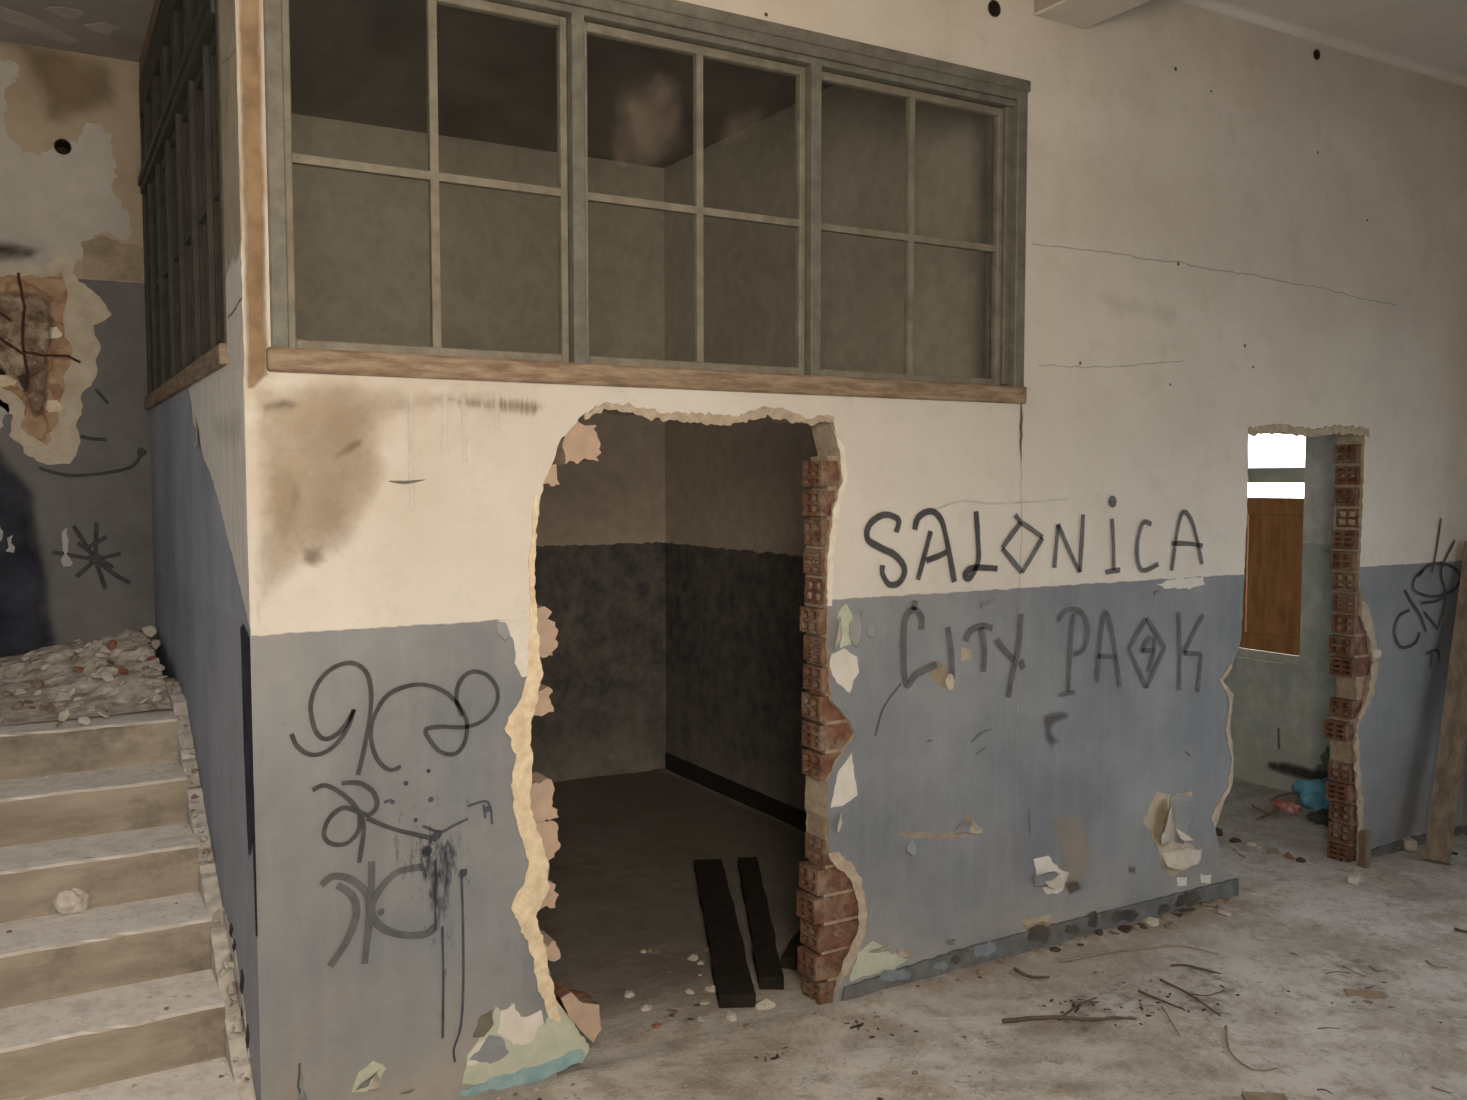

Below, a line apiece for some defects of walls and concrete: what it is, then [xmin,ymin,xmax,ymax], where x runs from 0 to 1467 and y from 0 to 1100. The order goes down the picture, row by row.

spalling [0,60,144,465]
peeling [0,528,15,553]
peeling [61,528,73,567]
flaking render [457,402,913,1096]
peeling [1143,663,1234,914]
peeling [1033,856,1069,894]
spalling [1022,909,1139,944]